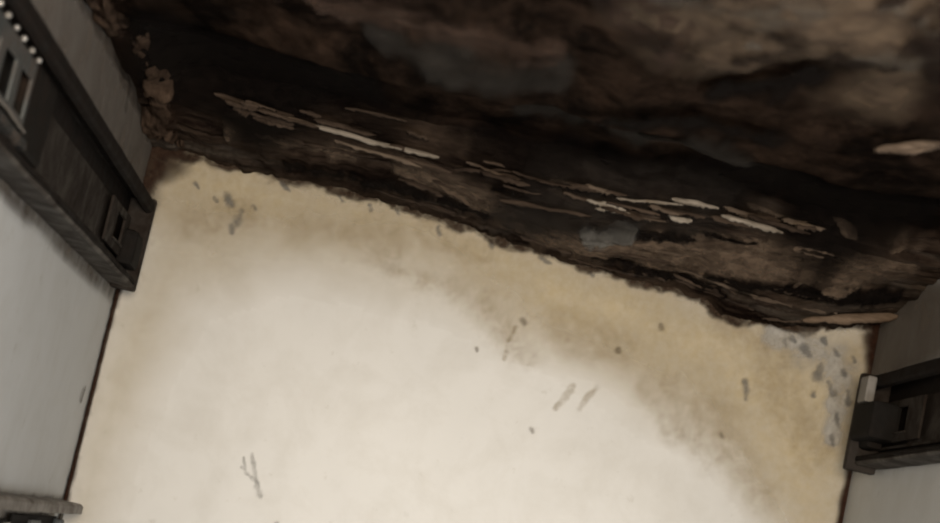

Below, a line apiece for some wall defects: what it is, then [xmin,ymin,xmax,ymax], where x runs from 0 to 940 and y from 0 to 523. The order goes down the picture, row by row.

peeling [85,0,128,38]
peeling [132,33,185,149]
water stain [113,15,395,148]
water stain [471,124,641,202]
peeling [491,158,742,249]
peeling [591,0,940,119]
water stain [659,161,940,284]
peeling [874,140,940,156]
water stain [143,146,868,523]